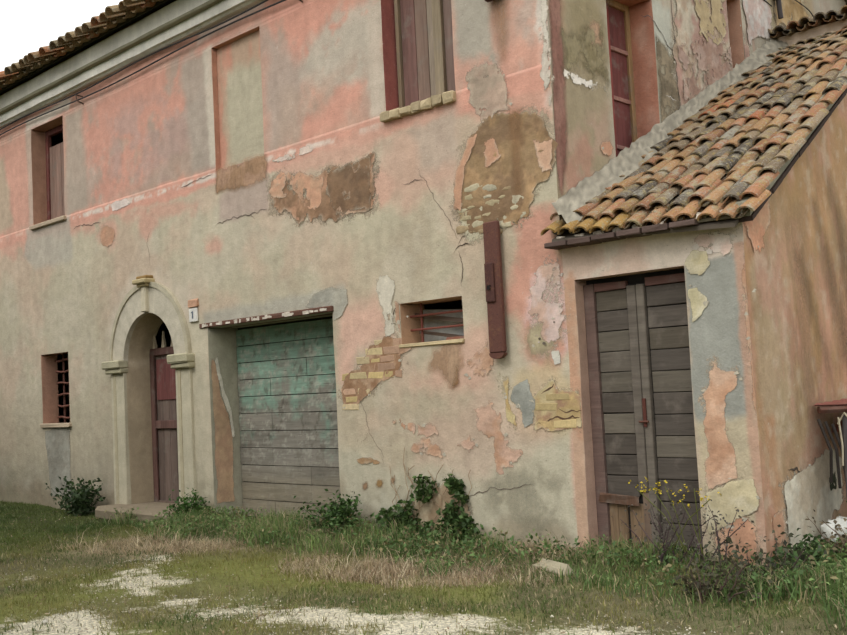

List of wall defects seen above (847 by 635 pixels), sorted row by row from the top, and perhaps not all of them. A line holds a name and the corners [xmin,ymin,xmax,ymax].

peeling [671,0,733,106]
peeling [740,0,773,59]
peeling [449,0,558,244]
crack [403,173,469,281]
spalling [339,301,411,410]
peeling [464,339,493,379]
peeling [474,376,523,475]
peeling [527,256,567,365]
spalling [529,377,582,433]
peeling [698,355,764,566]
spalling [773,448,846,564]